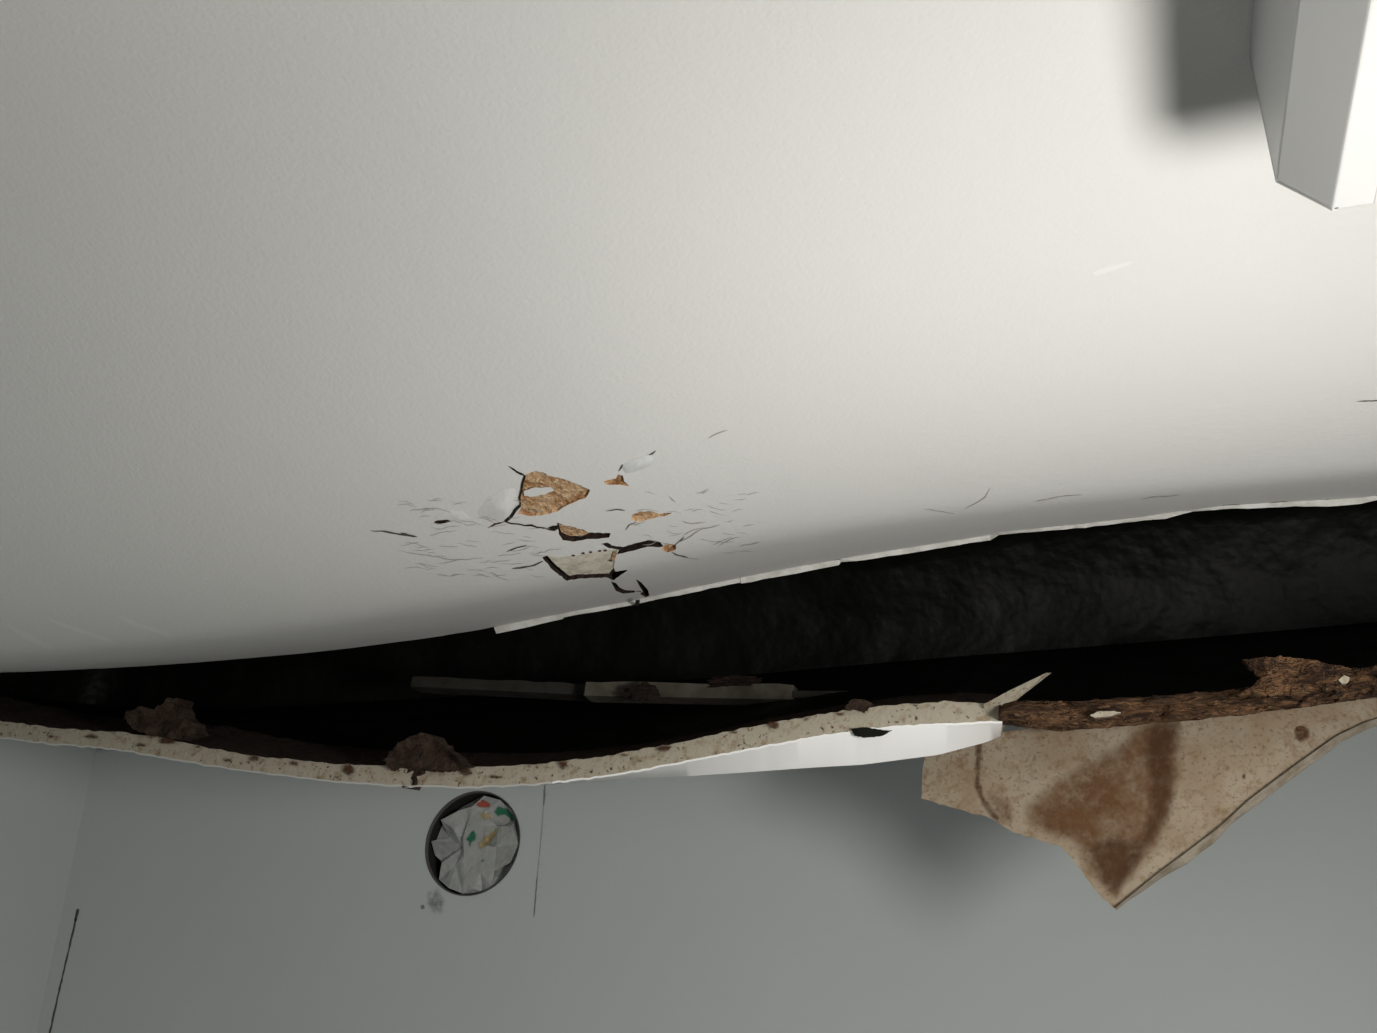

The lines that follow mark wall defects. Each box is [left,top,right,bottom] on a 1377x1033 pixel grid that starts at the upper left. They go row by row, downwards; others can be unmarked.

peeling [519,471,617,576]
peeling [632,511,664,519]
water stain [1035,725,1177,882]
peeling [921,656,1377,910]